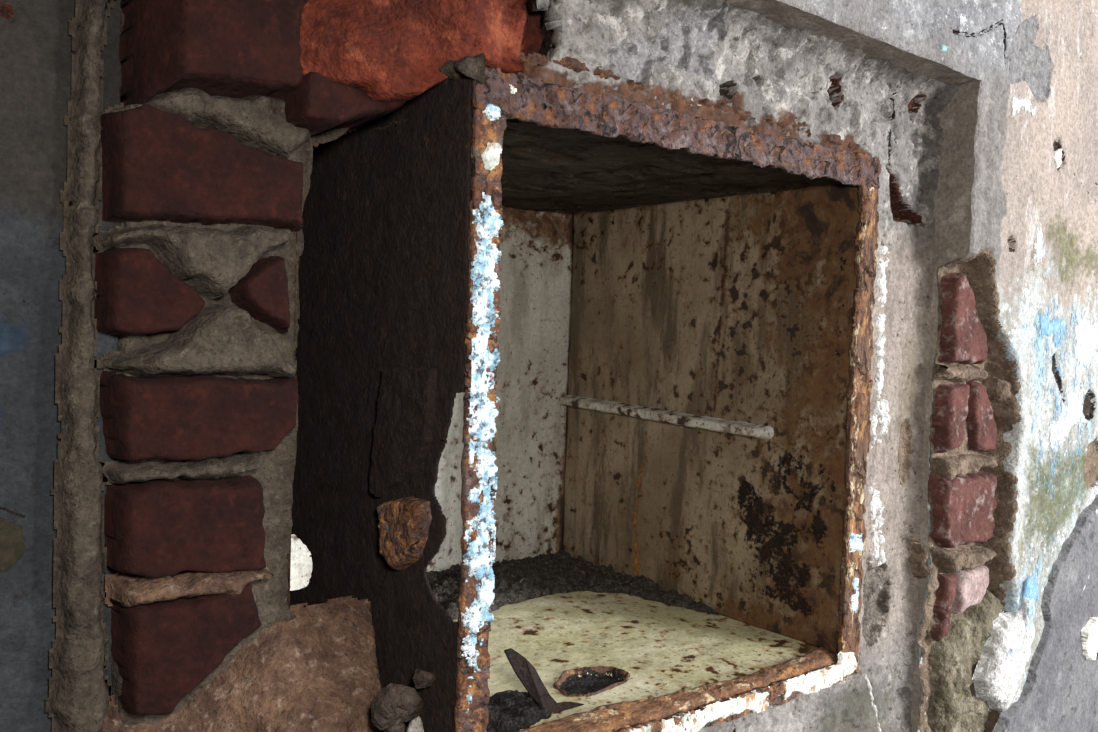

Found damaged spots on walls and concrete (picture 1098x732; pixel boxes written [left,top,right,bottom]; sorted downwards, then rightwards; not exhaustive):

spalling [541,19,551,57]
crack [951,19,1009,64]
corrosion [520,52,872,157]
spalling [898,418,915,485]
spalling [1083,437,1098,489]
flaking render [908,248,1036,732]
peeling [1081,617,1098,660]